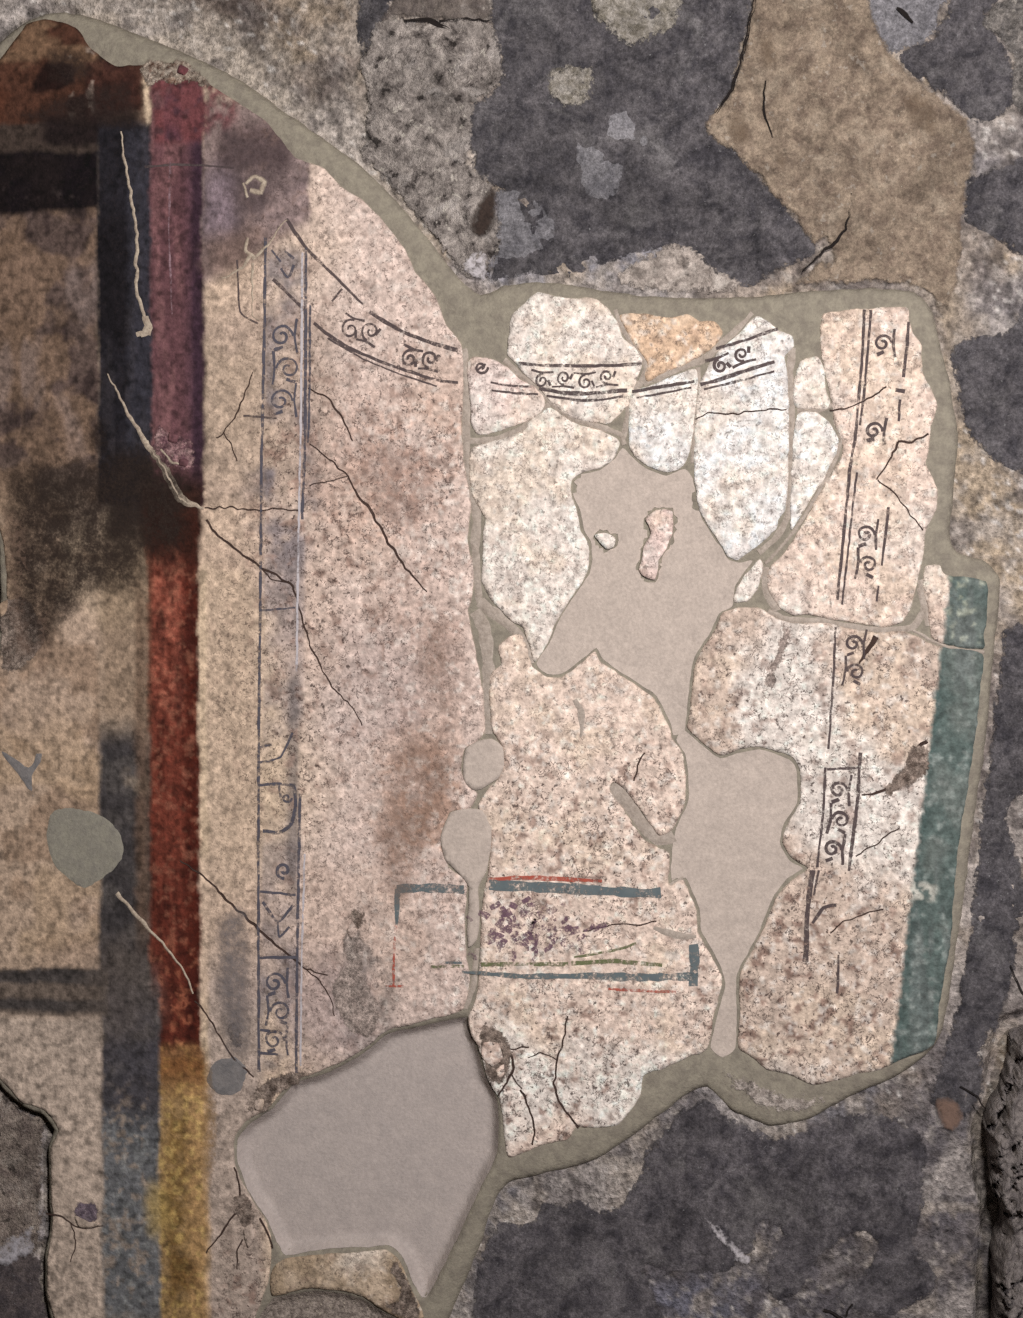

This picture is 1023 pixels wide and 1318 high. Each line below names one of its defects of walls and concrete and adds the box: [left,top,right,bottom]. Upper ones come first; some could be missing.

crack [715,0,774,138]
crack [802,202,853,272]
crack [144,388,427,726]
crack [462,309,984,737]
crack [180,860,335,1016]
flaking render [233,909,512,1318]
crack [498,1016,579,1145]
crack [824,1304,853,1318]